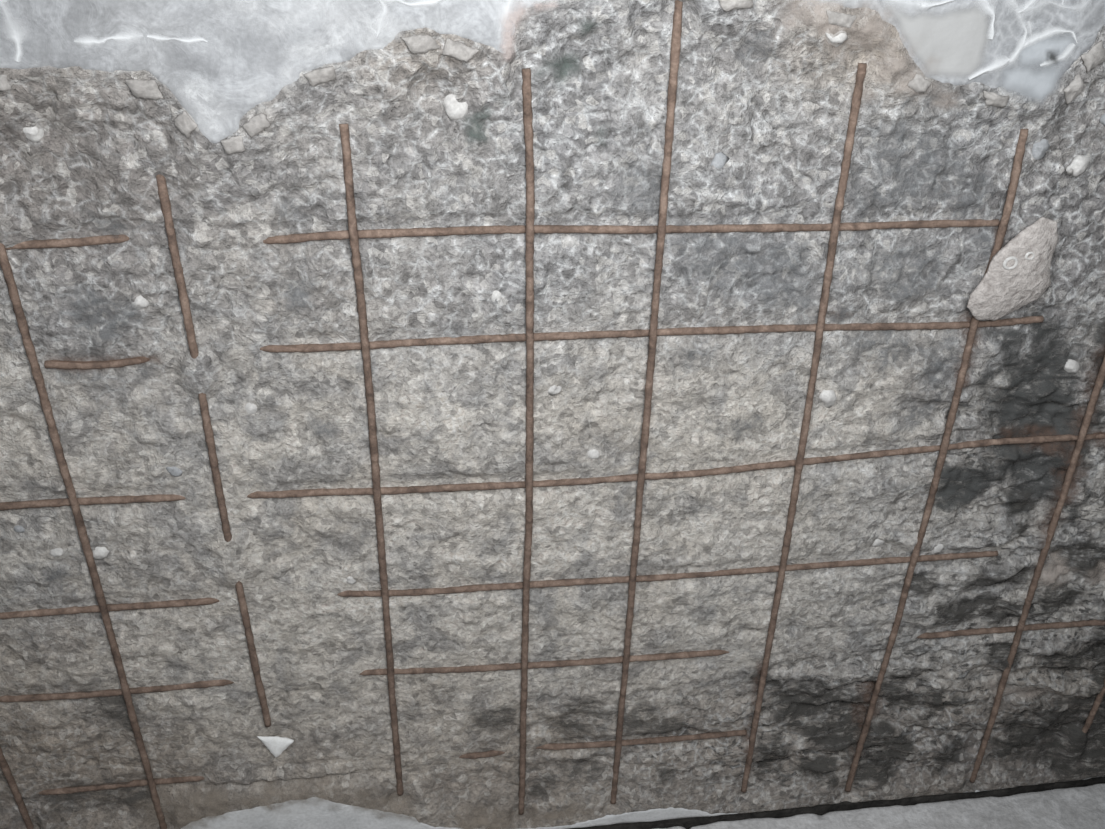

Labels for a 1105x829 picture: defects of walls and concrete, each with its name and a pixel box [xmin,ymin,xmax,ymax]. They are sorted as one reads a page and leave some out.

crack [10,23,21,62]
crack [74,35,207,45]
crack [985,0,1077,73]
spalling [0,243,167,829]
spalling [339,124,527,796]
spalling [518,68,658,815]
spalling [610,0,1105,804]
leakage [934,568,1032,624]
leakage [935,308,1103,534]
rust [1039,553,1068,584]
leakage [747,674,913,786]
leakage [987,626,1105,781]